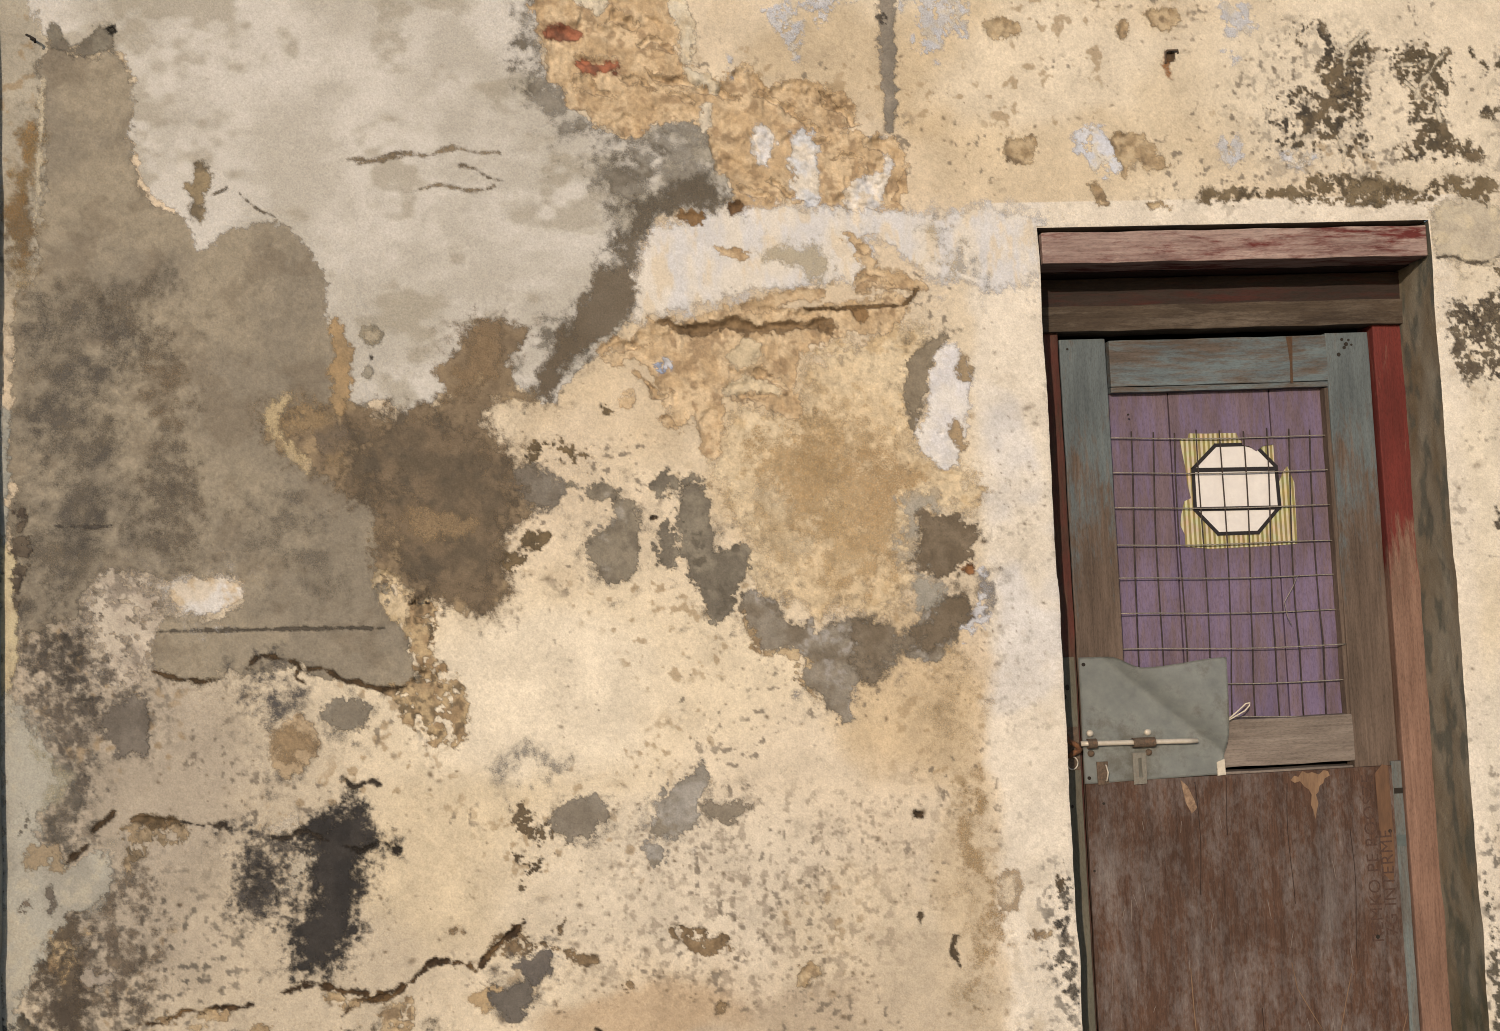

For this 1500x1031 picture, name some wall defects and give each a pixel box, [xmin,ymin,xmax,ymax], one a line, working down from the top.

flaking render [526,0,910,216]
damp [1195,19,1500,209]
damp [1447,267,1500,387]
peeling [0,407,33,713]
damp [258,317,567,619]
peeling [595,231,987,623]
crack [152,654,405,692]
crack [66,810,116,863]
damp [214,790,403,983]
crack [125,918,526,1031]
crack [341,775,382,790]
flaking render [669,925,732,957]